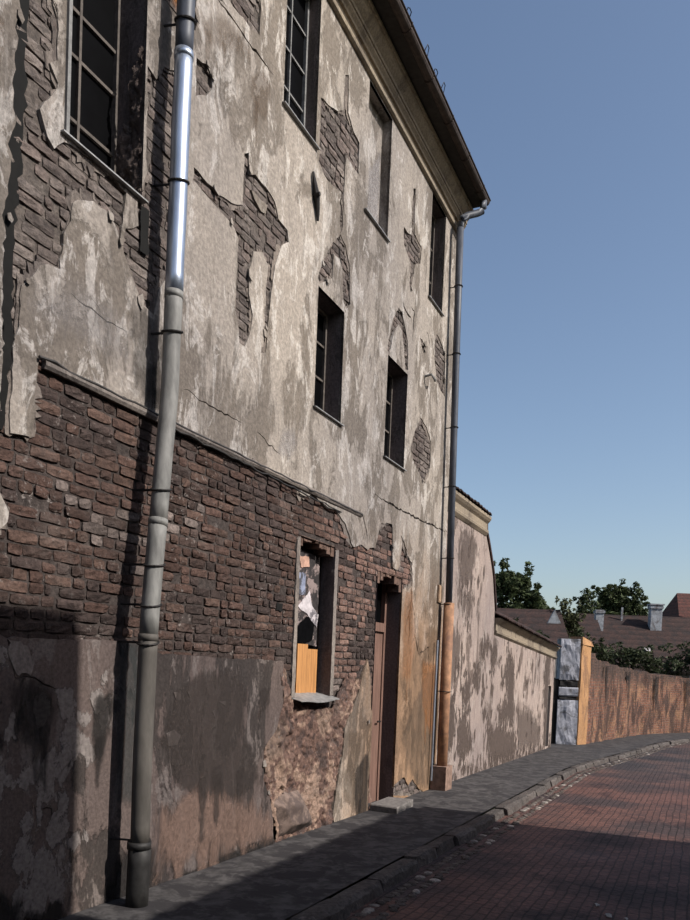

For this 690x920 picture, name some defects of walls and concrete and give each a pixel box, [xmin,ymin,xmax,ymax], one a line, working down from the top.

flaking render [2,0,174,341]
flaking render [193,154,288,353]
flaking render [318,75,358,308]
flaking render [404,189,421,291]
flaking render [0,359,158,678]
crack [381,499,442,530]
flaking render [411,418,431,483]
flaking render [157,431,412,842]
damp [93,695,111,784]
damp [149,666,275,888]
damp [0,892,66,920]
damp [105,852,128,902]